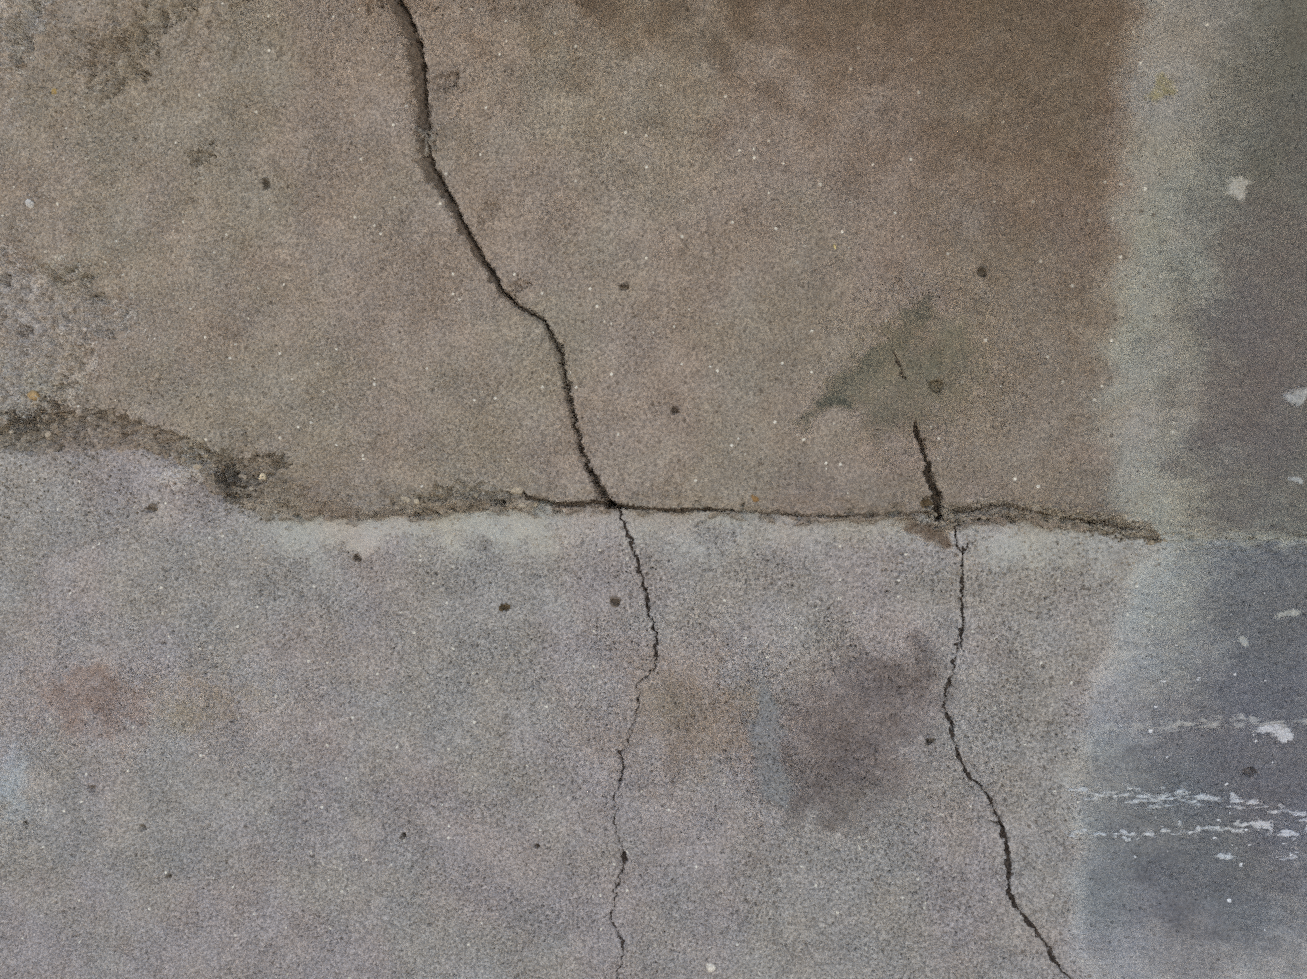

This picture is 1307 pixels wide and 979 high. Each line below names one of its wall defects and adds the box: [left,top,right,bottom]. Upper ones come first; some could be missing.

crack [331,0,1141,978]
leakage [802,295,986,436]
leakage [705,0,1126,207]
leakage [1065,0,1307,979]